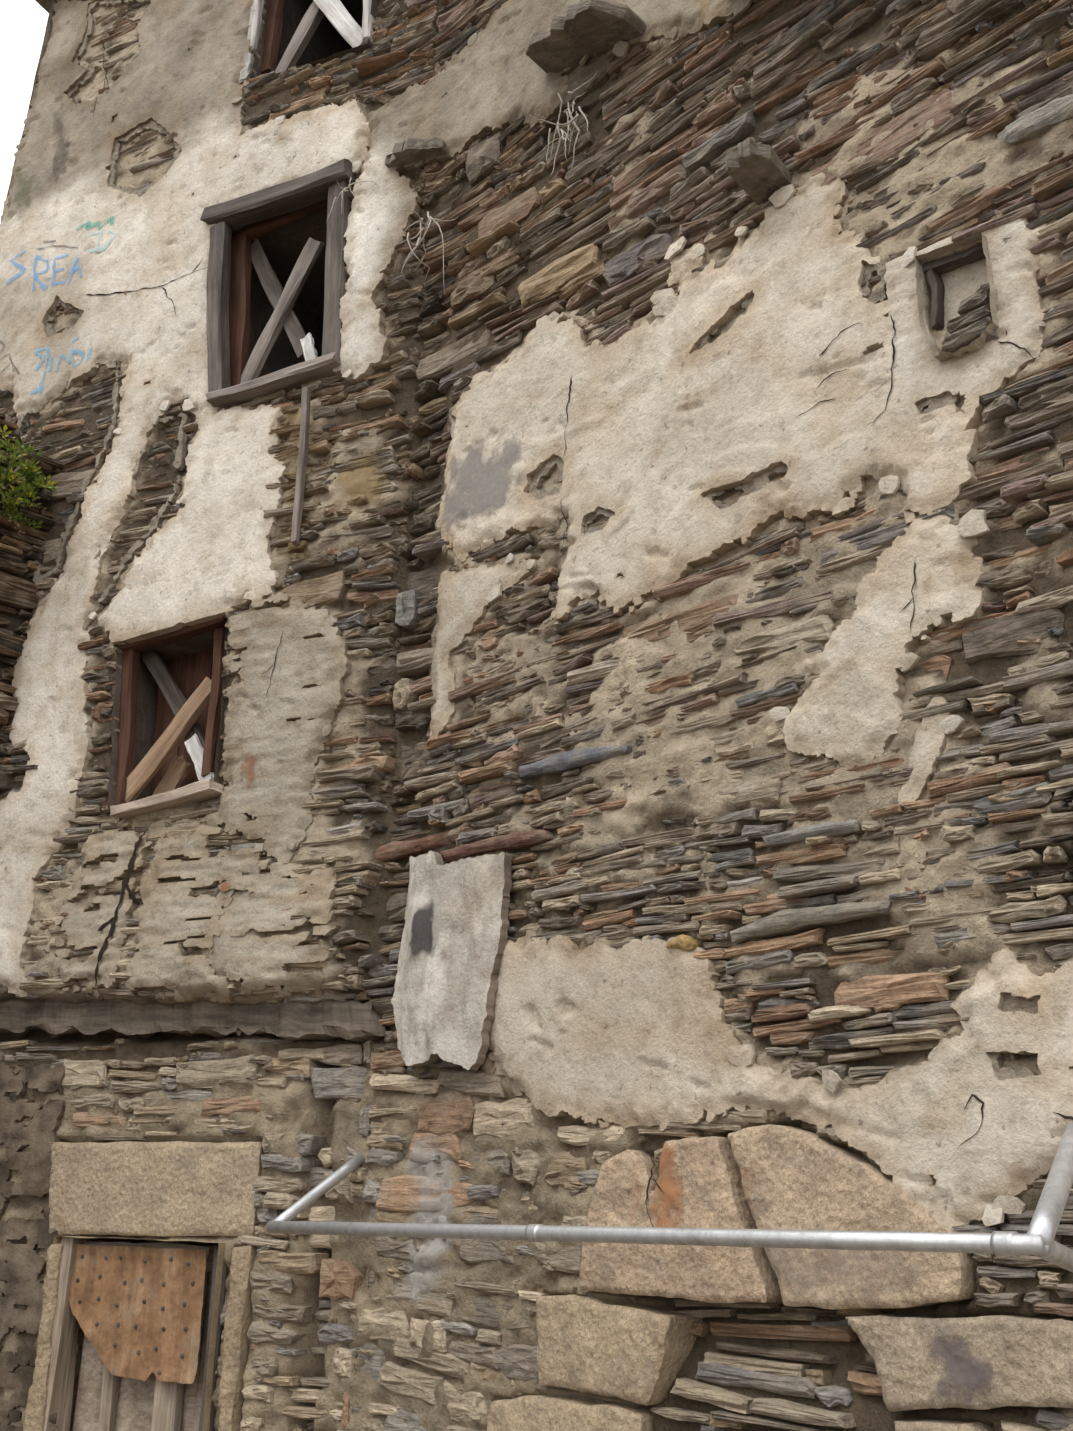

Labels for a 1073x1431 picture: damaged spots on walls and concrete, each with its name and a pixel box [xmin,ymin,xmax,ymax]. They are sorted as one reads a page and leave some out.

peeling [607,0,763,58]
crack [81,259,208,315]
peeling [0,0,588,997]